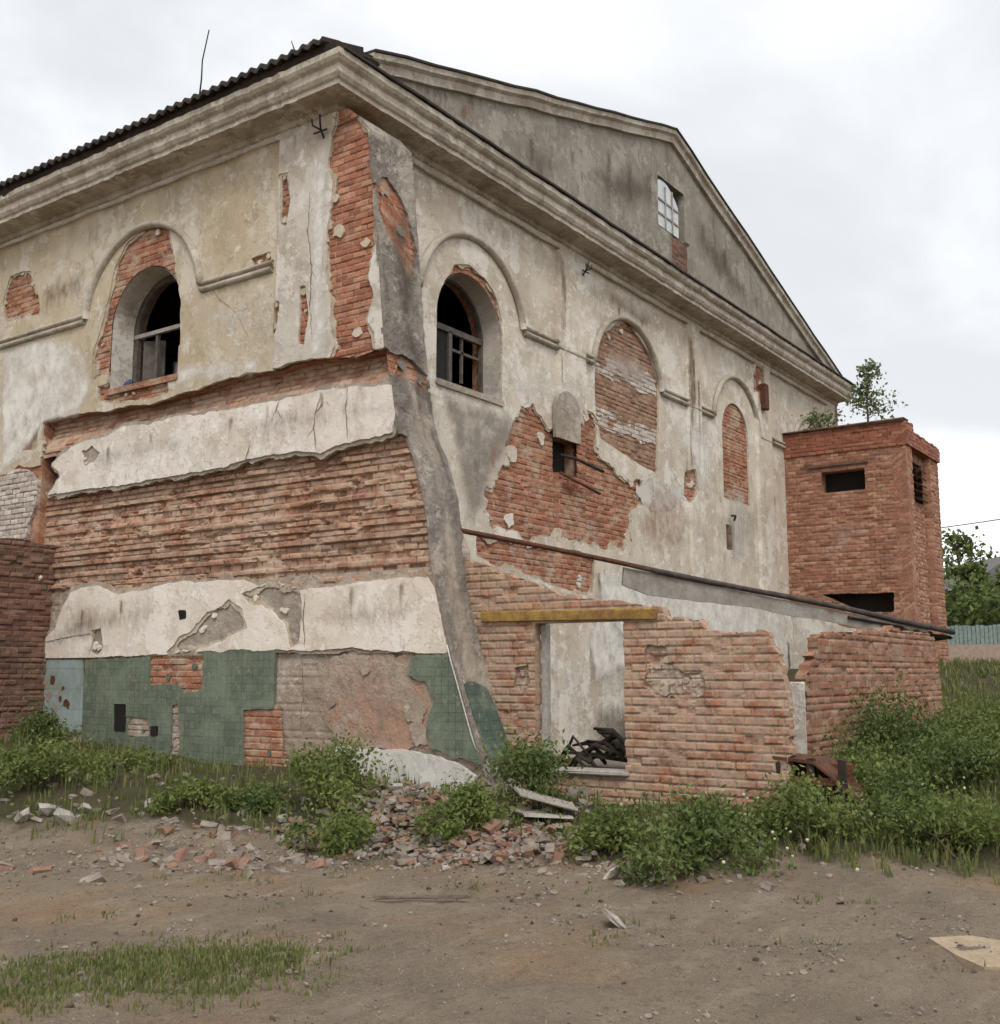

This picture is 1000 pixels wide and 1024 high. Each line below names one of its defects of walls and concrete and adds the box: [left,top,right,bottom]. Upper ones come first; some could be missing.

peeling [2,228,229,467]
flaking render [47,108,427,500]
crack [307,396,348,448]
flaking render [607,322,636,340]
flaking render [476,379,791,677]
flaking render [44,572,447,754]
spalling [244,705,291,768]